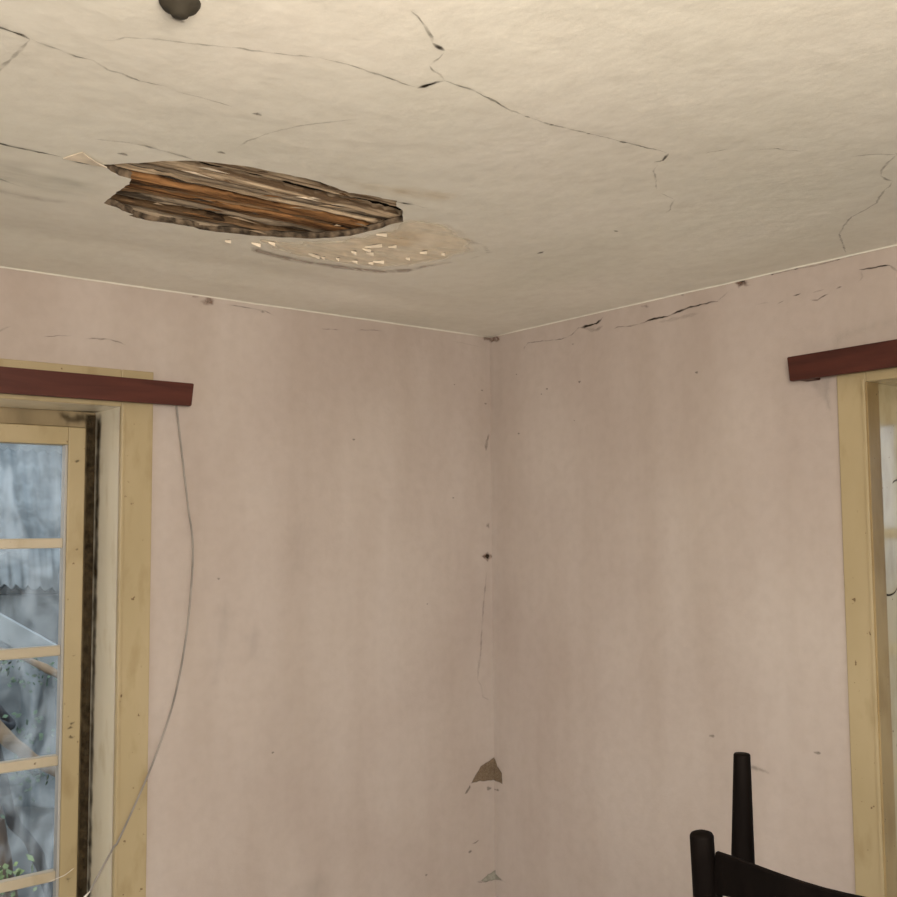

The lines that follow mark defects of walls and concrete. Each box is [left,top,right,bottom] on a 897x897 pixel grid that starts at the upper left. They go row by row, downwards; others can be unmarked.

spalling [104,198,403,265]
crack [646,302,710,322]
spalling [466,758,502,793]